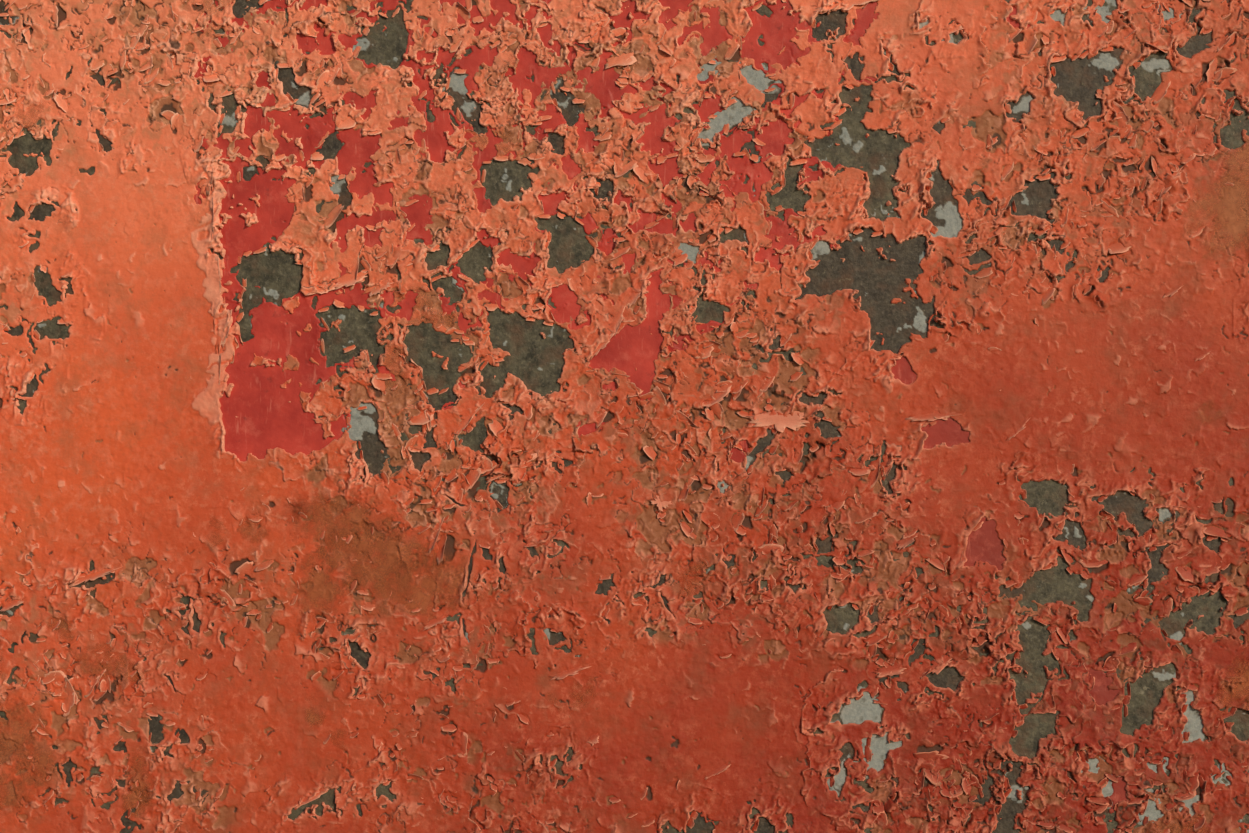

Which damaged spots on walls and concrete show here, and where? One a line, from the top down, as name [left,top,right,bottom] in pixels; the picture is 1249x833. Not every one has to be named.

peeling [0,0,71,199]
peeling [95,129,113,155]
peeling [88,0,287,130]
peeling [28,203,56,221]
peeling [0,264,72,357]
peeling [192,0,599,565]
peeling [12,373,39,400]
peeling [577,0,1249,833]
peeling [10,619,116,717]
peeling [310,580,380,682]
peeling [43,702,214,833]
peeling [283,770,354,822]